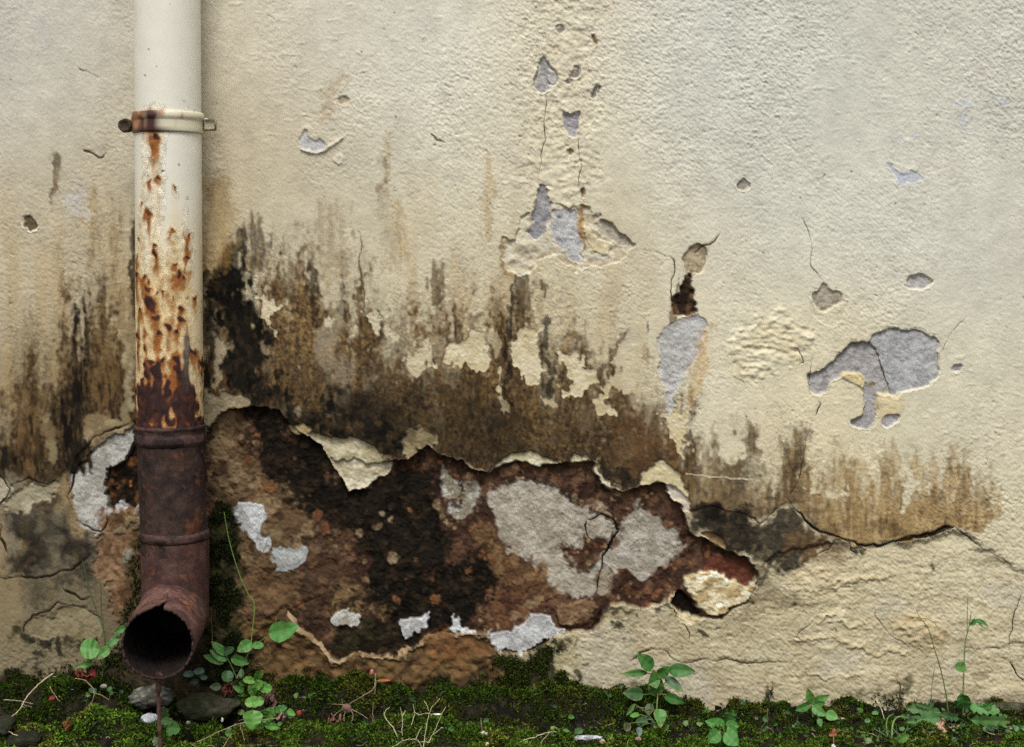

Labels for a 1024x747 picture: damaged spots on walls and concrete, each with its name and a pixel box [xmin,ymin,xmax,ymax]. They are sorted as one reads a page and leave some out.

water stain [48,149,74,211]
crack [0,424,128,634]
peeling [0,432,140,640]
water stain [0,182,283,700]
corrosion [134,101,169,111]
corrosion [134,131,204,429]
spalling [204,240,752,689]
spalling [498,0,637,282]
crack [584,508,618,593]
water stain [202,130,1006,641]
crack [695,347,1014,568]
peeling [805,326,964,434]